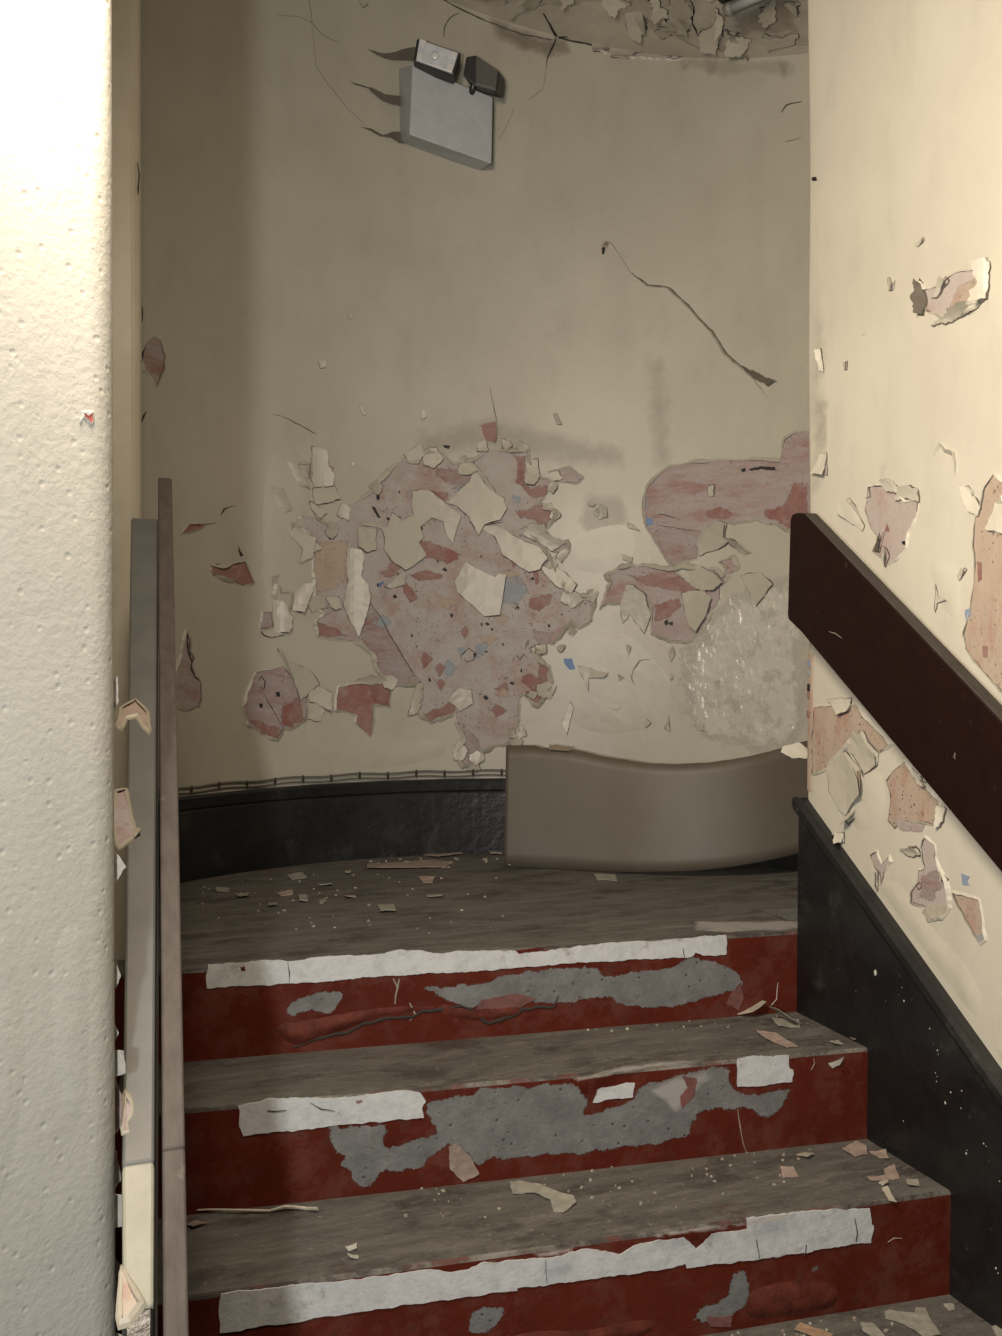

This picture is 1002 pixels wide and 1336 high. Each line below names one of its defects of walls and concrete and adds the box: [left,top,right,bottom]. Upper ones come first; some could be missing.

crack [443,0,592,139]
peeling [504,0,808,62]
crack [609,242,777,397]
peeling [910,257,991,327]
peeling [241,421,828,774]
peeling [835,478,920,567]
peeling [933,443,1002,693]
peeling [781,653,987,946]
spalling [287,990,343,1016]
spalling [424,955,802,1048]
spalling [329,1066,790,1187]
spalling [694,1270,749,1327]